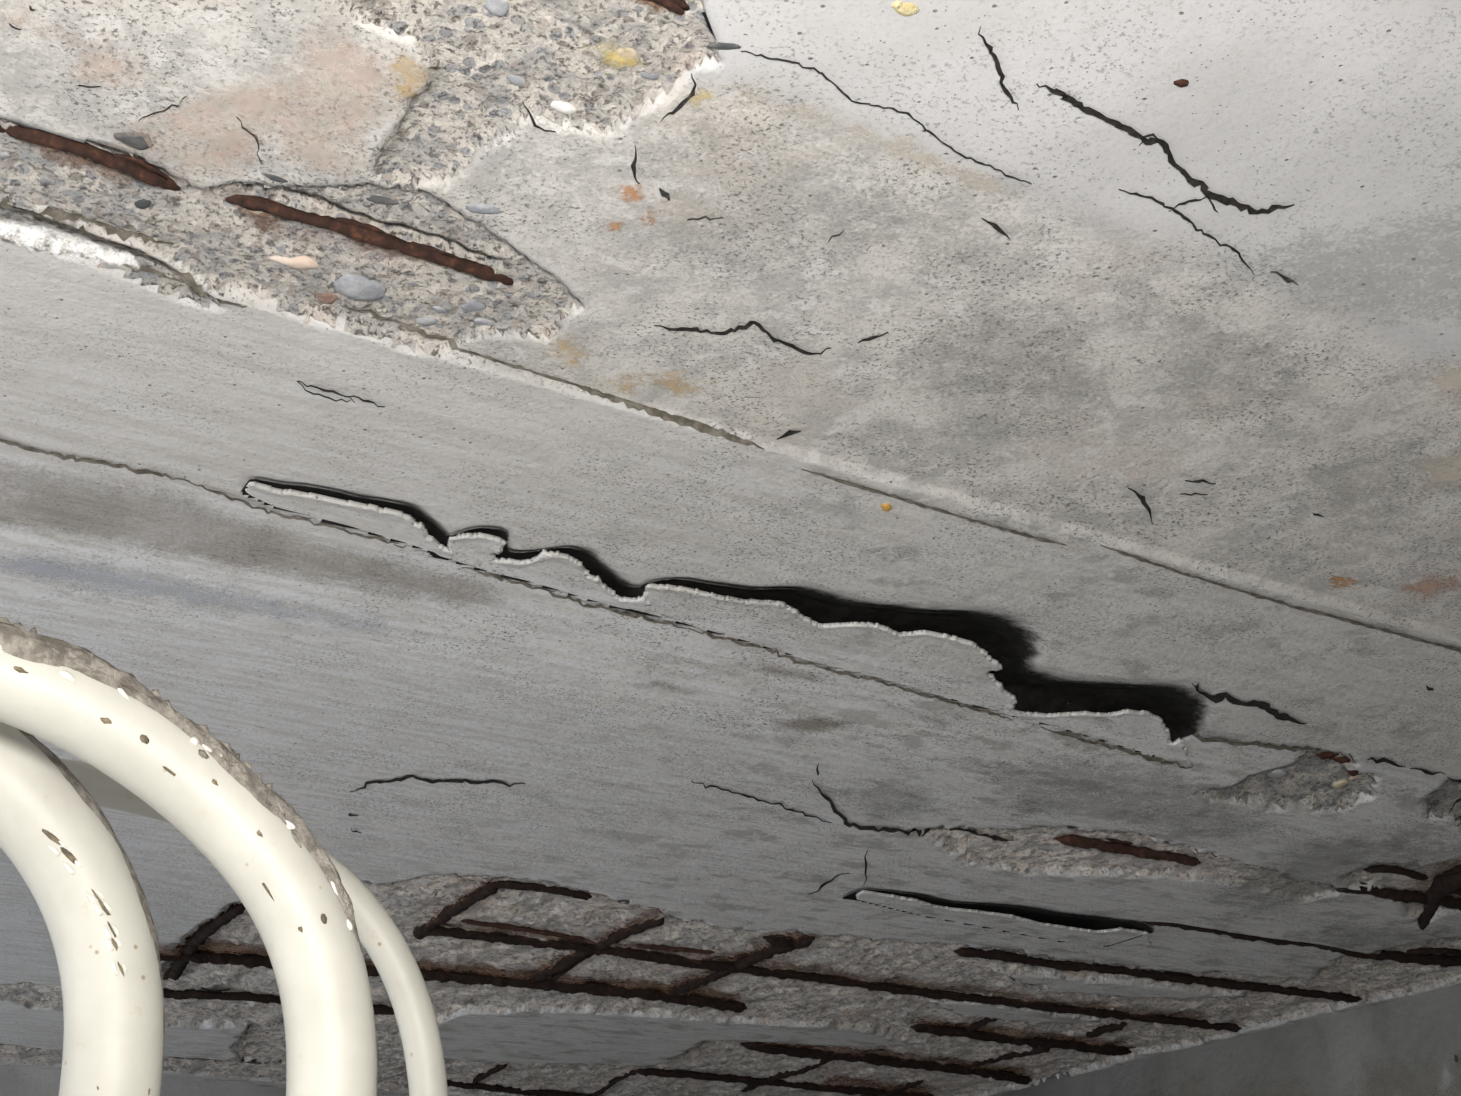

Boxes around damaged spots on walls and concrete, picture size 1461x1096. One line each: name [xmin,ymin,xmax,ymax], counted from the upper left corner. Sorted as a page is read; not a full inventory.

spalling [0,0,741,358]
crack [741,51,1032,185]
crack [978,26,1298,285]
crack [654,321,888,355]
crack [240,479,1306,768]
crack [691,763,1153,947]
spalling [1194,749,1377,811]
spalling [1424,779,1461,830]
rust [159,939,269,957]
rust [414,880,1206,1020]
spalling [362,826,1461,1096]
rust [766,1043,1026,1077]